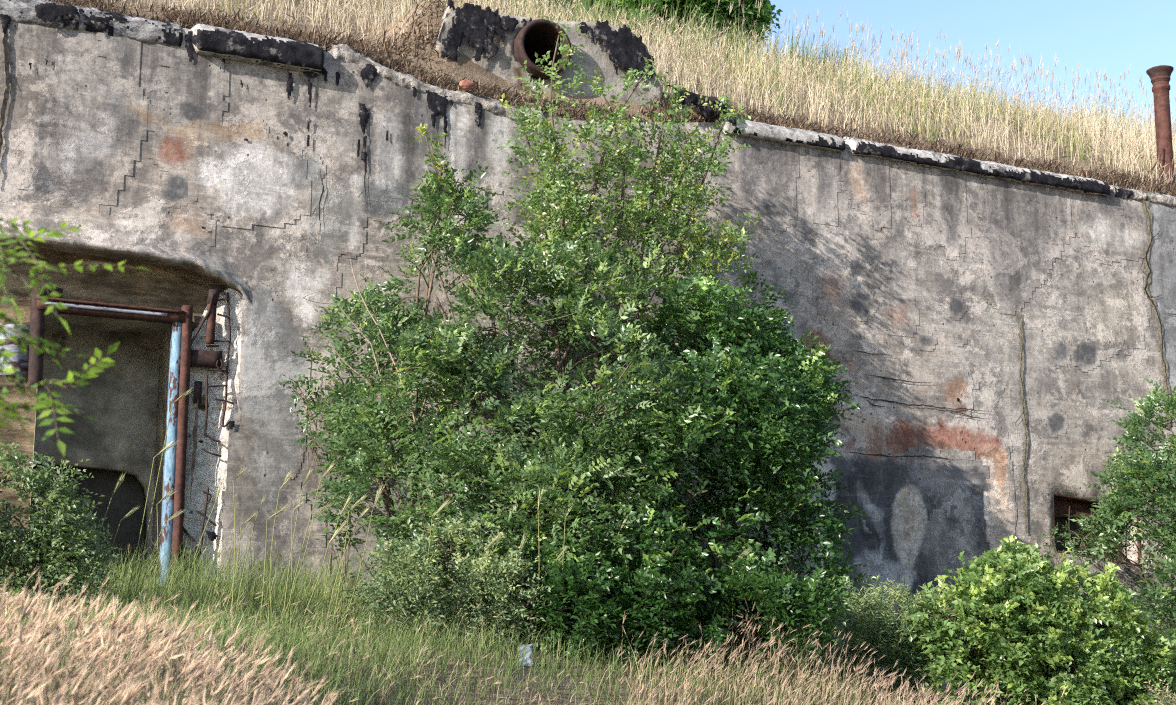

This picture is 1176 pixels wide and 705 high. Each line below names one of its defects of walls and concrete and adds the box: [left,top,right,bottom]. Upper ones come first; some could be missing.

crack [0,0,16,174]
leakage [0,2,340,229]
leakage [269,63,558,337]
leakage [828,448,906,596]
rust [798,319,1012,460]
crack [829,311,1029,534]
crack [1140,189,1176,429]